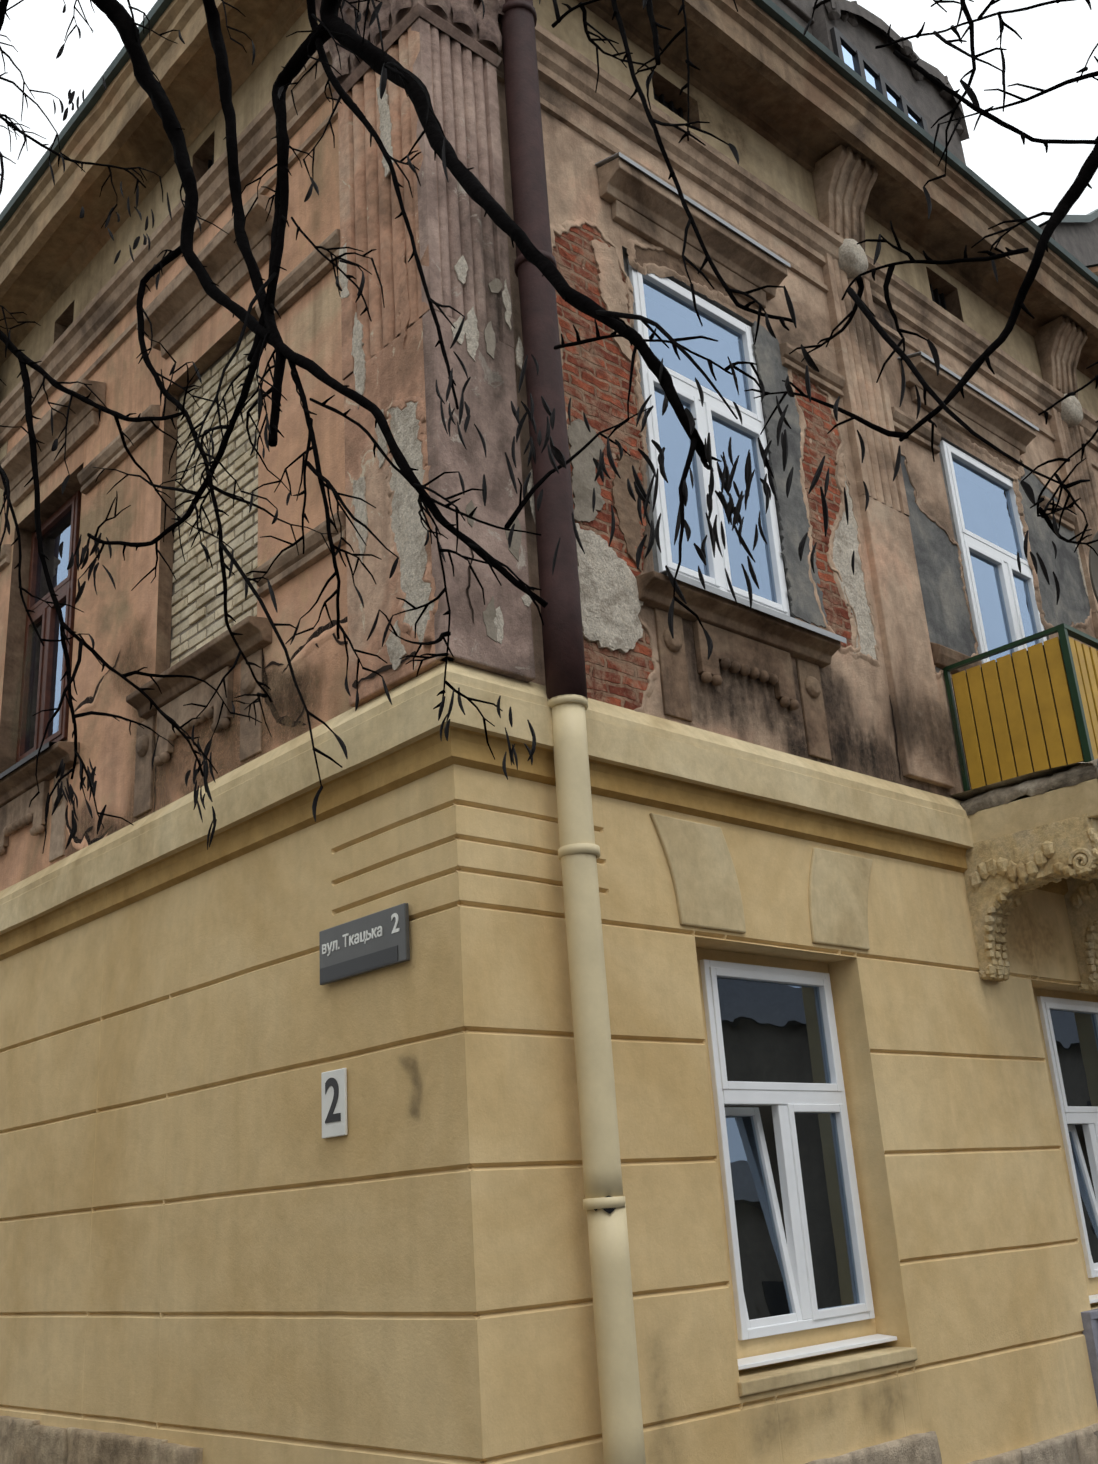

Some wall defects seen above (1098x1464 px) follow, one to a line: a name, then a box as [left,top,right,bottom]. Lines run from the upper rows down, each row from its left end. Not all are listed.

peeling [376,87,394,178]
peeling [339,243,366,409]
peeling [353,396,439,670]
flaking render [550,216,766,714]
flaking render [788,369,861,654]